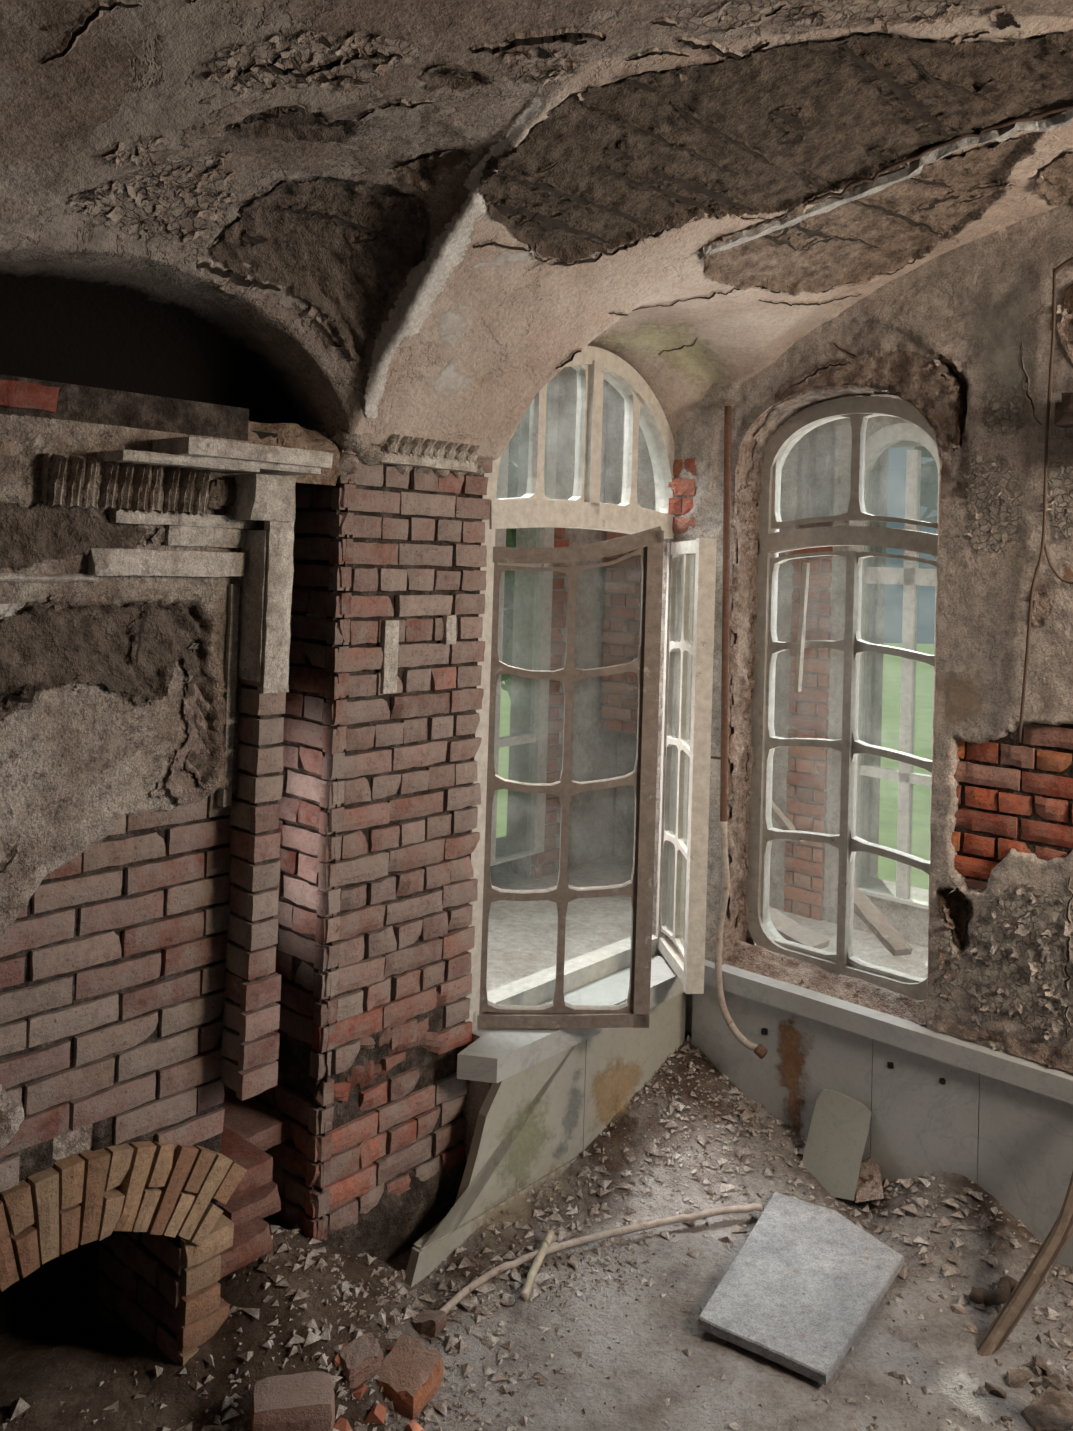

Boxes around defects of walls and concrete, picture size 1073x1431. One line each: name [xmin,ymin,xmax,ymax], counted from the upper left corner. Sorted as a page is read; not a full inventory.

crack [40,0,143,64]
crack [233,48,404,83]
peeling [207,30,492,143]
crack [357,99,432,121]
peeling [502,49,591,87]
flaking render [69,134,468,370]
crack [555,255,926,369]
flaking render [727,348,1028,927]
flaking render [0,594,230,807]
flaking render [928,722,1073,1073]
flaking render [0,1110,15,1140]
rust [778,1020,805,1137]